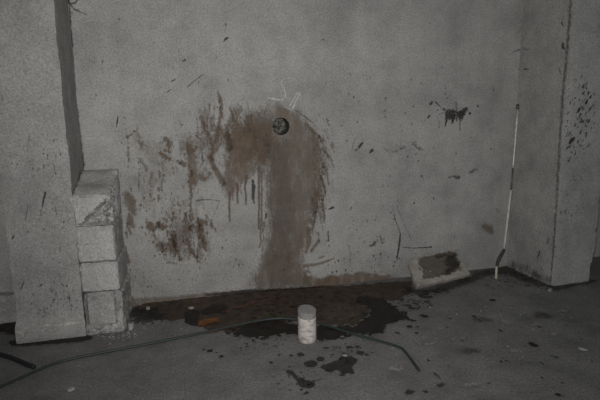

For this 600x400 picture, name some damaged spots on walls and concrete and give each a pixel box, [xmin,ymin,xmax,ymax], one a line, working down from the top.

corrosion [125,188,145,236]
corrosion [141,137,213,262]
water stain [130,94,390,326]
water stain [225,306,298,348]
water stain [286,267,595,395]